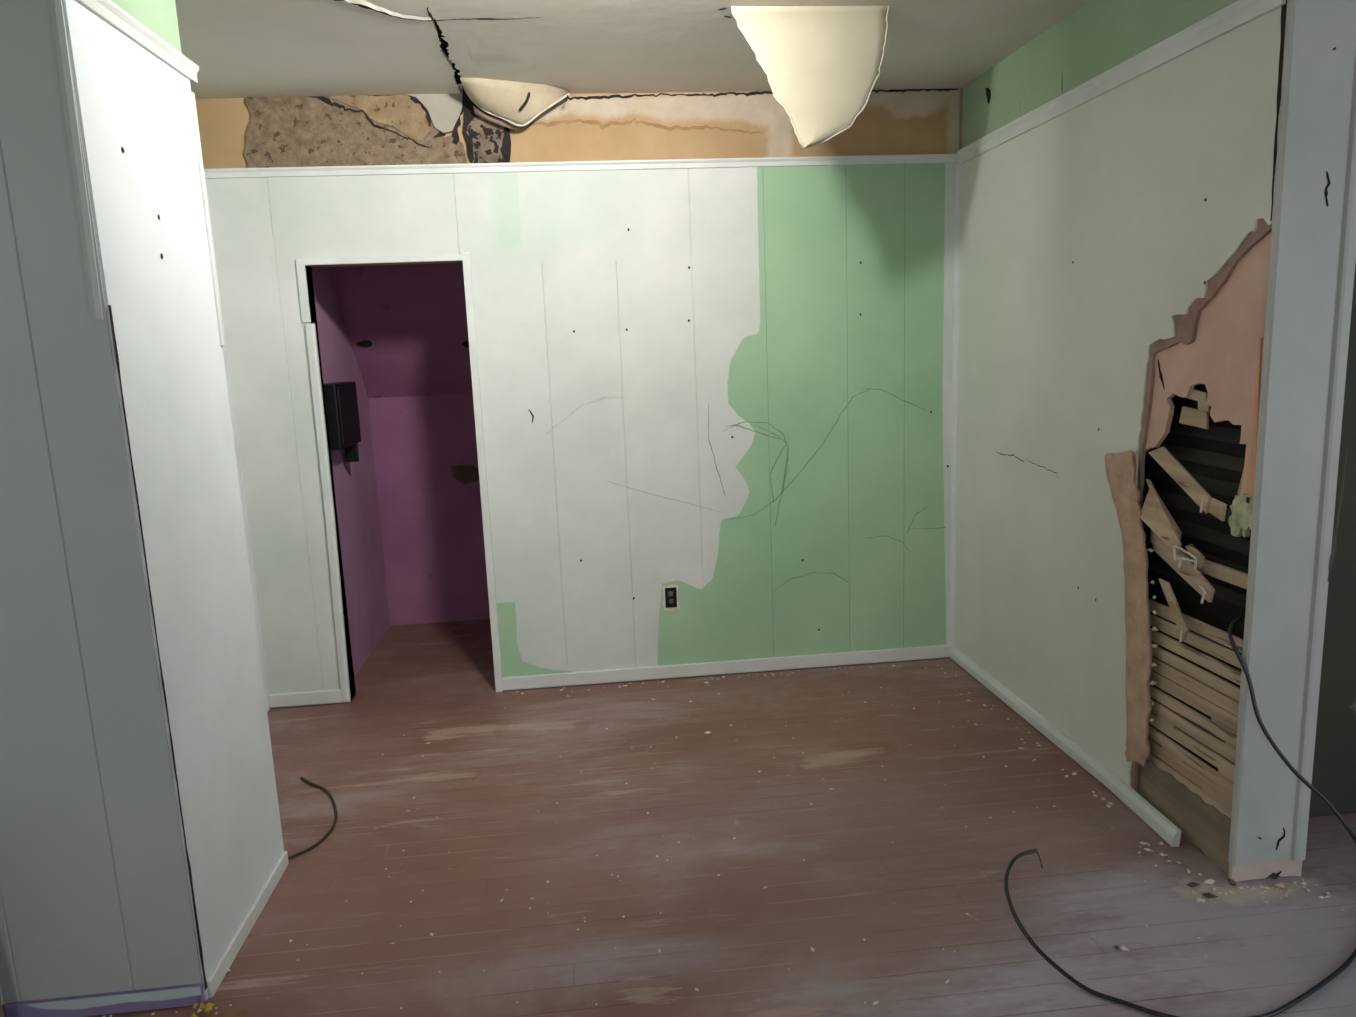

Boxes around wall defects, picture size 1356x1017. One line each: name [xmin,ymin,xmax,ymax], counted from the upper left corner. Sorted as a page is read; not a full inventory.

flaking render [243,77,570,256]
crack [334,0,539,94]
crack [1270,0,1287,221]
peeling [652,163,1031,666]
peeling [496,598,579,677]
spalling [1104,218,1272,875]